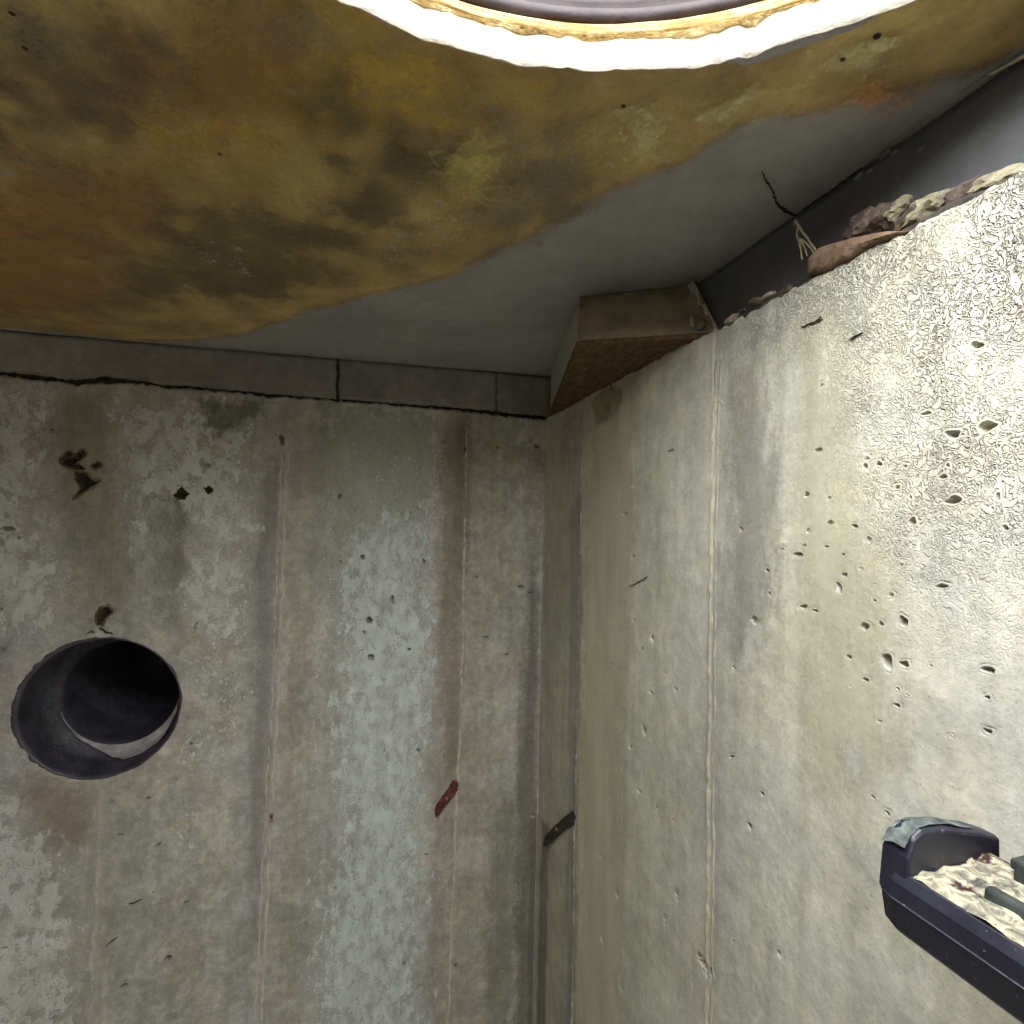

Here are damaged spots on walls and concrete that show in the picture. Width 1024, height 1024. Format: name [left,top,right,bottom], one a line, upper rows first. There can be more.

water stain [0,0,1024,341]
crack [762,167,862,216]
crack [0,359,544,420]
spalling [58,448,103,500]
corrosion [435,780,459,816]
corrosion [543,811,576,846]